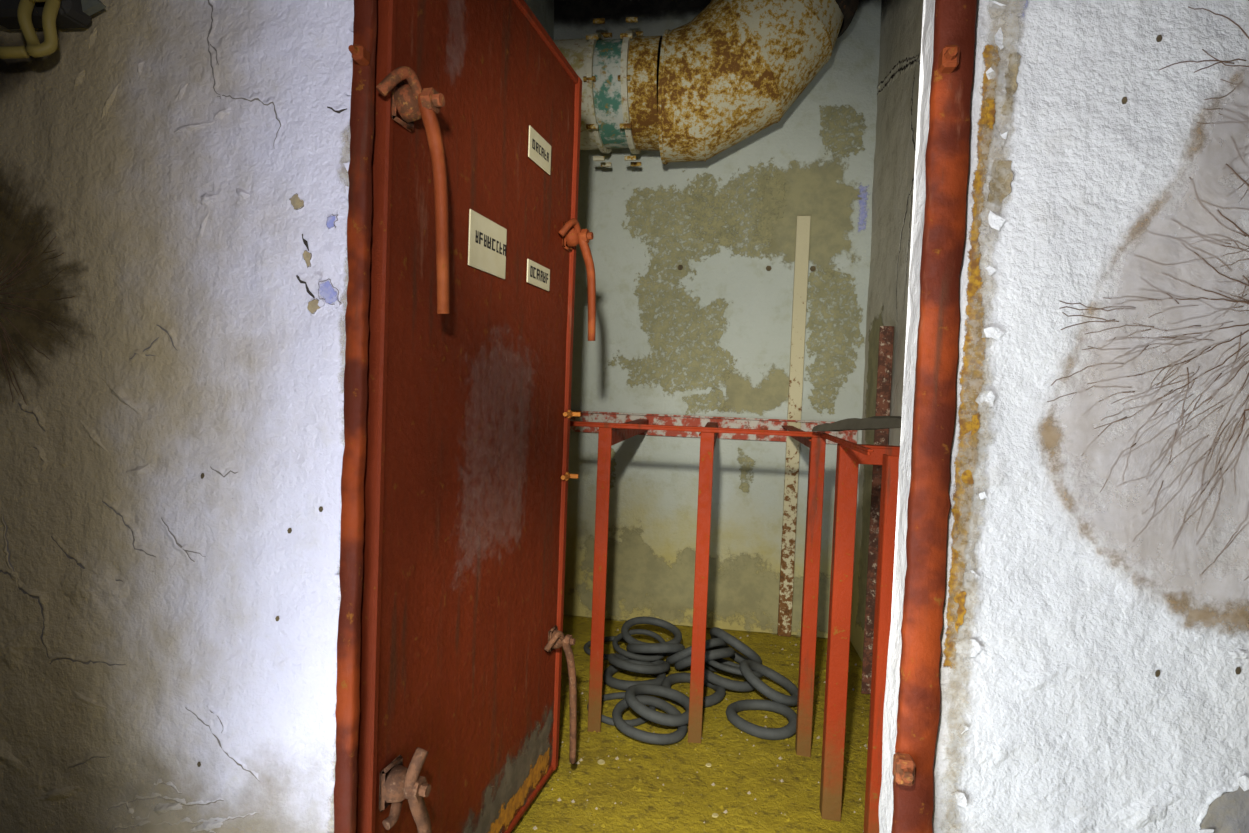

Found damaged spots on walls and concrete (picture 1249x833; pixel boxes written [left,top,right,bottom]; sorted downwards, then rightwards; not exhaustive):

crack [207,0,286,149]
leakage [0,172,79,405]
peeling [608,105,867,416]
rust [943,45,1001,669]
leakage [1040,418,1062,471]
crack [0,514,126,666]
leakage [1169,599,1249,633]
peeling [1195,774,1249,833]